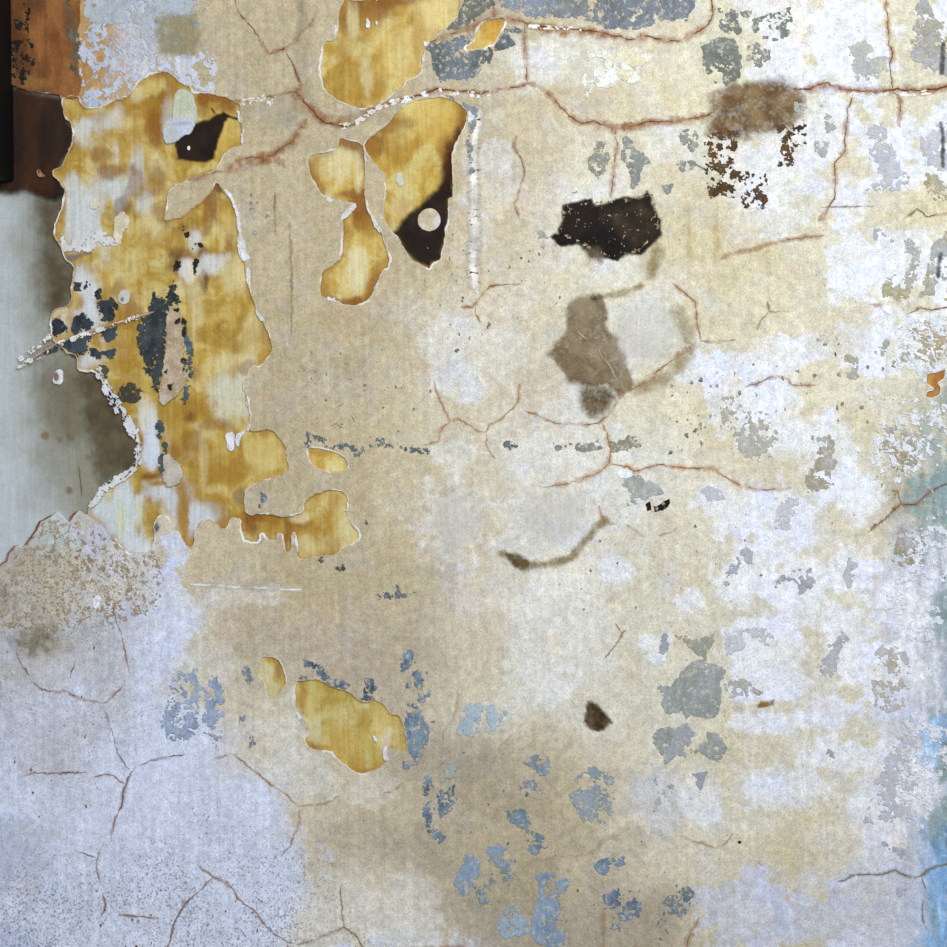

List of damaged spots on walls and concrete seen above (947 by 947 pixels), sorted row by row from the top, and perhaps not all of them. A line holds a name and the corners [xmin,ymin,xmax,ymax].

peeling [306,95,479,306]
crack [235,0,714,192]
peeling [318,0,696,110]
peeling [588,136,651,189]
crack [725,2,947,257]
peeling [0,0,369,571]
damp [548,284,668,416]
crack [543,356,775,491]
damp [500,519,606,570]
crack [31,610,185,831]
peeling [242,649,430,776]
crack [167,866,362,947]